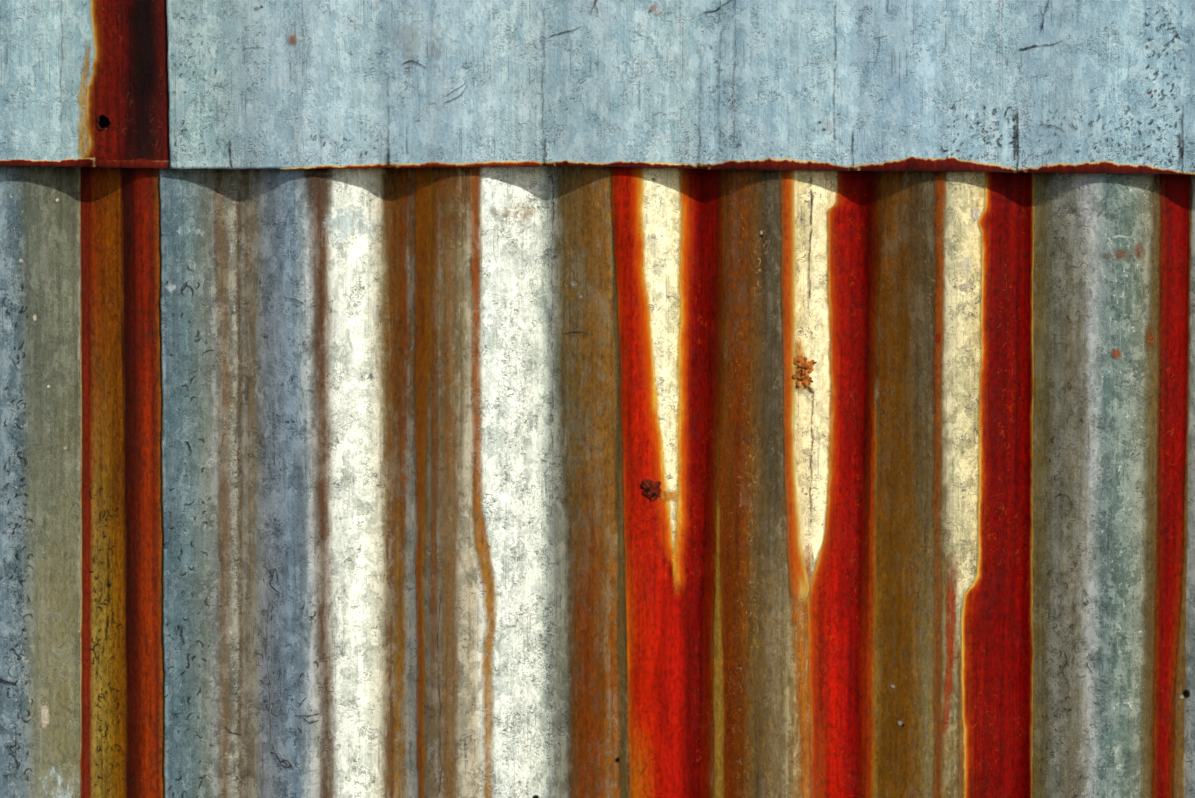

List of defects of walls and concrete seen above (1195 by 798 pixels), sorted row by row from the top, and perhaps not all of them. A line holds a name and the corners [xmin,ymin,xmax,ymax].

rust [0,0,170,798]
rust [281,156,1195,798]